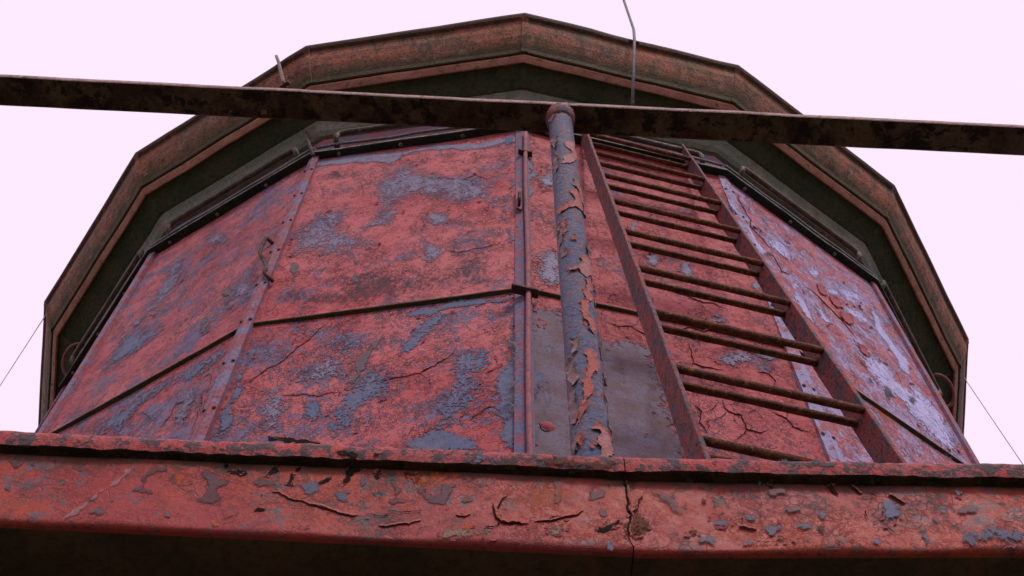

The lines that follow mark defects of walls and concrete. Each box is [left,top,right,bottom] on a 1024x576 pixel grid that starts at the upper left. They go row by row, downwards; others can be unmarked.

peeling [286,134,577,258]
peeling [92,342,227,436]
crack [242,322,329,385]
peeling [256,354,392,454]
peeling [398,293,516,462]
peeling [532,176,685,459]
peeling [708,348,775,368]
crack [694,367,810,440]
peeling [726,189,961,458]
peeling [198,467,331,503]
crack [456,496,584,527]
crack [624,478,644,545]